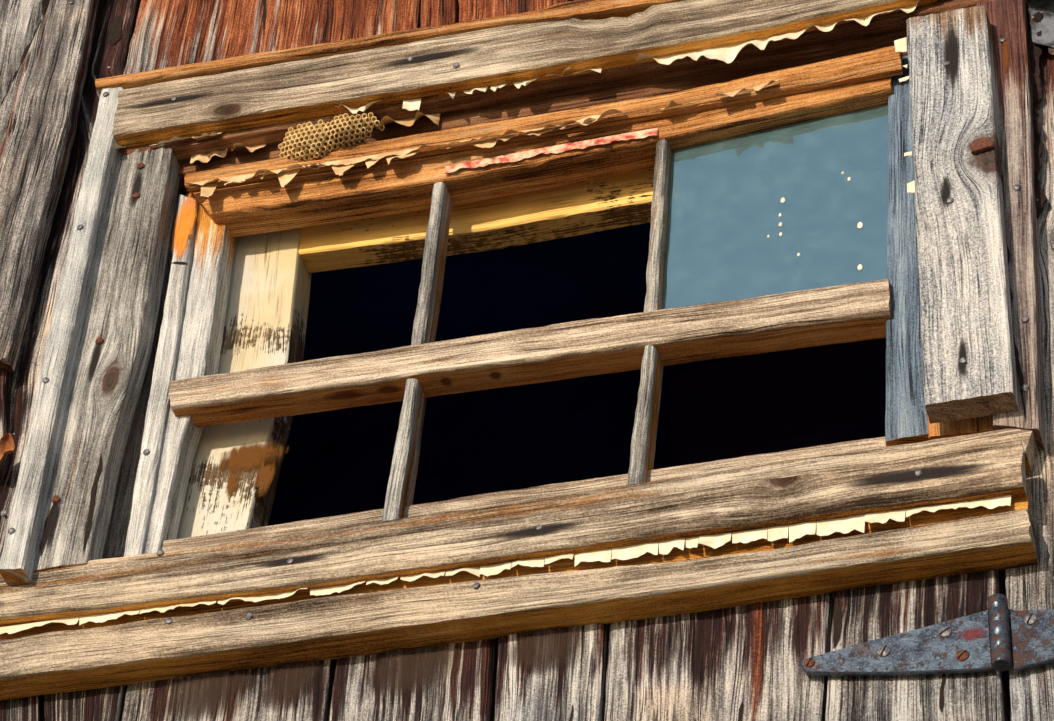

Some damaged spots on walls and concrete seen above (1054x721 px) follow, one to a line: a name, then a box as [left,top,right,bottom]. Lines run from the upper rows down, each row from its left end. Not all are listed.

peeling [635,0,920,65]
peeling [446,67,602,99]
peeling [716,80,778,97]
peeling [336,100,380,114]
peeling [377,98,440,129]
peeling [149,132,222,146]
peeling [185,109,658,197]
peeling [0,495,1011,635]